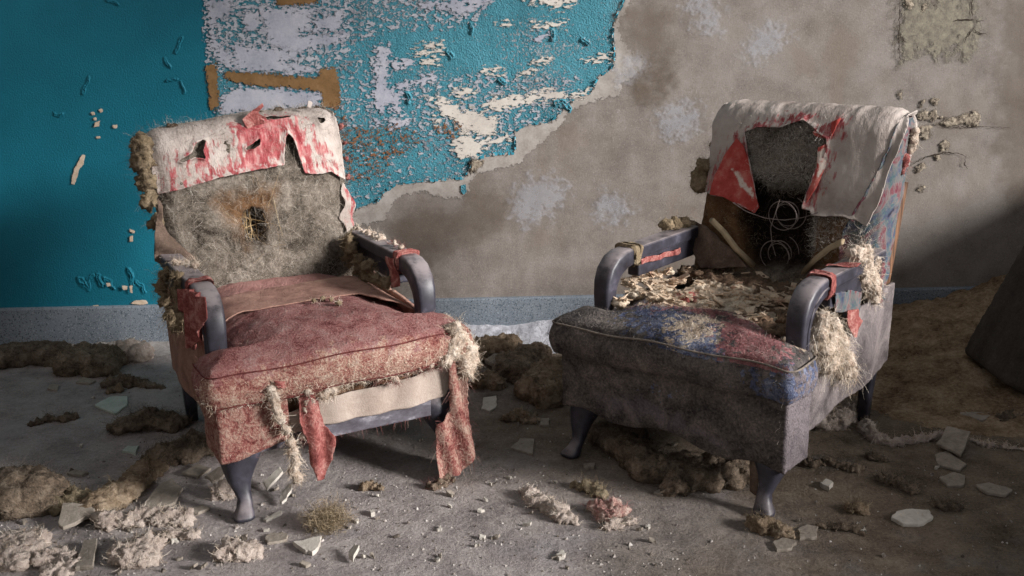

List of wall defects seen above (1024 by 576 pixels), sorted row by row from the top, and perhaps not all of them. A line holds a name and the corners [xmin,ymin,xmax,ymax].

crack [898,3,906,63]
crack [956,0,986,43]
peeling [71,155,85,185]
peeling [201,0,1024,299]
peeling [106,283,148,305]